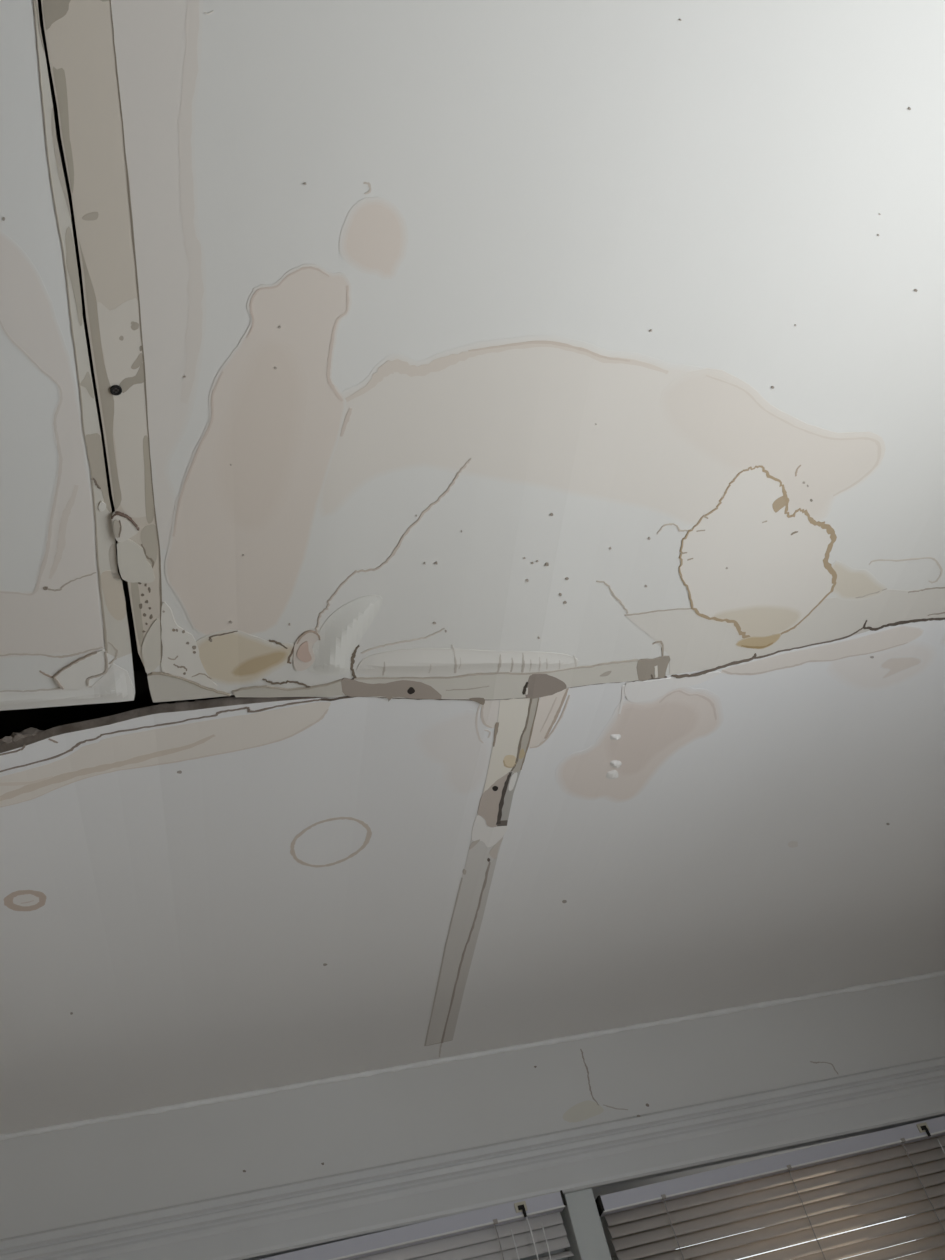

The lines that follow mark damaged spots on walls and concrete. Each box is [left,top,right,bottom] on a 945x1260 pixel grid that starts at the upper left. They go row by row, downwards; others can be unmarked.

peeling [35,0,71,50]
peeling [51,66,217,690]
water stain [111,0,945,691]
crack [0,458,520,772]
crack [596,581,628,613]
crack [565,612,945,689]
water stain [0,702,331,808]
water stain [555,685,724,803]
water stain [290,817,372,867]
peeling [469,772,510,859]
water stain [4,890,46,911]